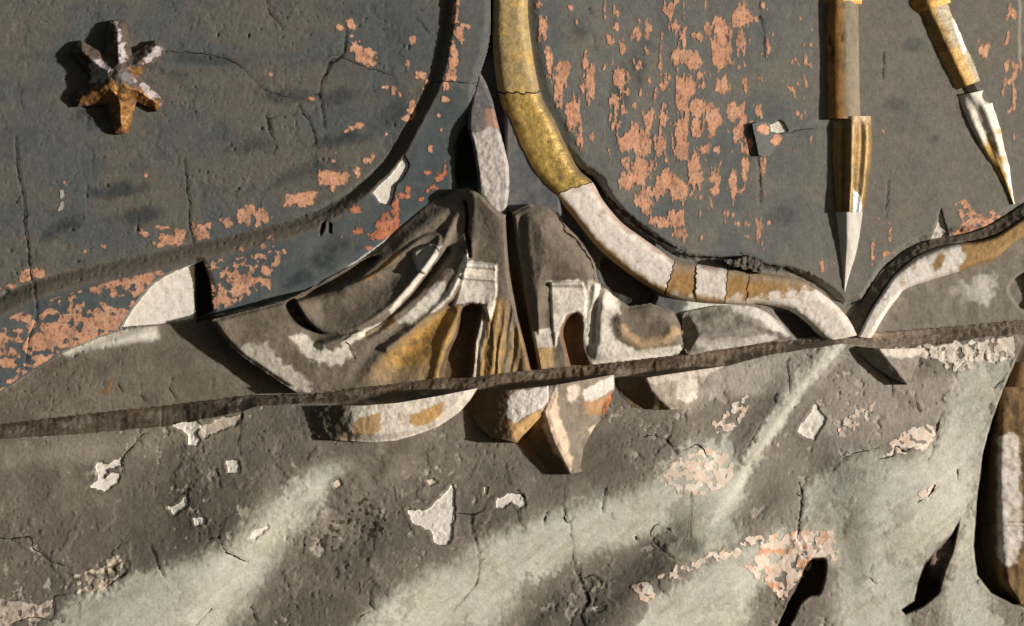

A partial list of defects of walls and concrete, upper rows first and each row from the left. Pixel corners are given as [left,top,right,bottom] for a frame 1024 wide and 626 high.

crack [164,29,391,155]
peeling [405,0,471,131]
peeling [536,0,787,250]
peeling [138,204,272,248]
peeling [283,152,375,207]
peeling [319,157,447,250]
peeling [210,235,287,309]
peeling [0,264,195,391]
flaking render [895,336,1015,372]
flaking render [90,458,122,491]
flaking render [408,485,455,545]
flaking render [632,530,839,602]